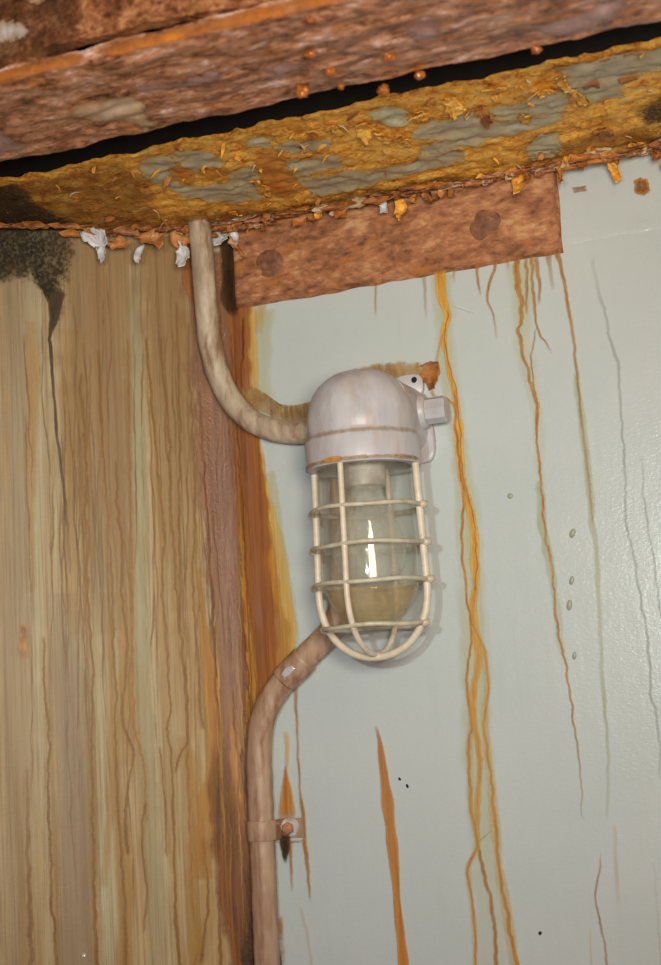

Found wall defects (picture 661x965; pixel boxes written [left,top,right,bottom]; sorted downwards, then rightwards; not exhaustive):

peeling [80,227,108,263]
peeling [73,70,224,132]
leakage [145,231,192,405]
peeling [175,240,190,267]
peeling [138,150,264,205]
peeling [246,48,661,197]
leakage [0,185,148,696]
corrosion [105,208,295,965]
corrosion [417,271,519,965]
corrosion [513,252,581,763]
corrosion [279,696,310,890]
corrosion [377,734,409,965]